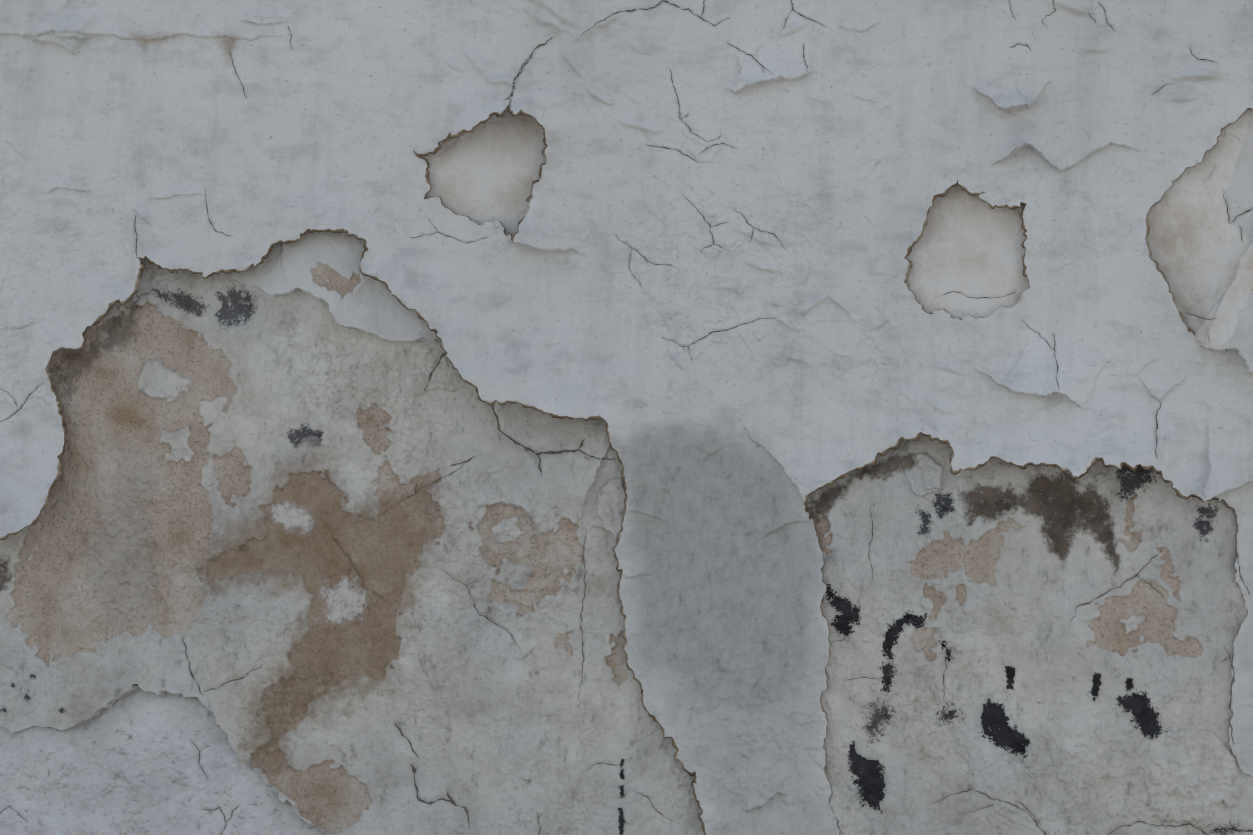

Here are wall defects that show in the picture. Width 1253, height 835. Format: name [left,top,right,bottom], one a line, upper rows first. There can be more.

peeling [408,54,561,235]
crack [683,196,785,251]
peeling [898,163,1039,320]
mould [152,284,258,333]
crack [662,318,775,360]
peeling [0,192,717,835]
leakage [809,455,916,522]
leakage [915,464,1157,571]
mould [1192,503,1218,542]
crack [1230,523,1250,595]
peeling [805,390,1253,835]
crack [1220,644,1234,744]